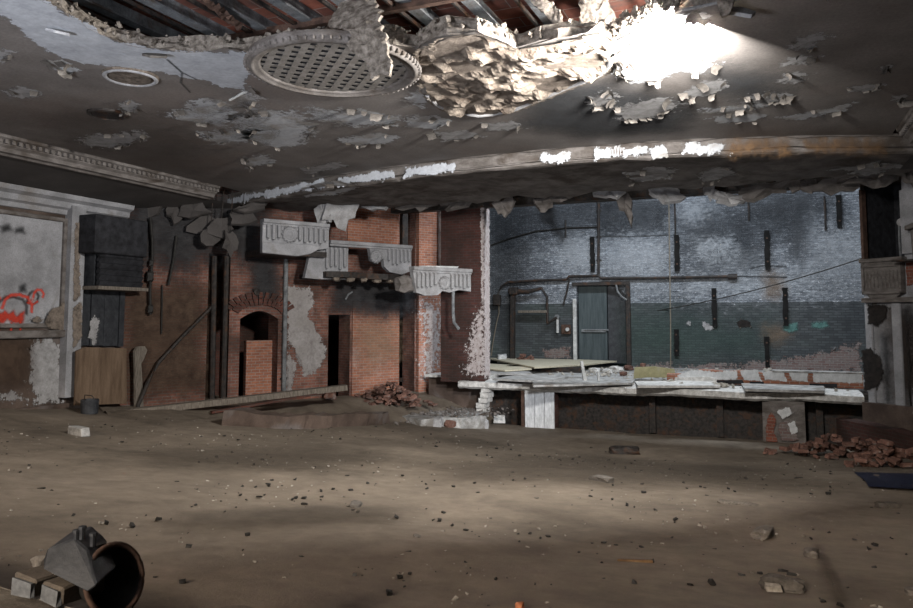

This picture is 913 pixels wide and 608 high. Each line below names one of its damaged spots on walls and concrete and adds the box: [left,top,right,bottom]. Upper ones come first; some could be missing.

spalling [0,0,895,172]
peeling [227,162,456,204]
peeling [594,144,678,187]
peeling [682,141,737,186]
peeling [0,222,100,406]
peeling [286,284,327,391]
spalling [332,275,415,293]
peeling [415,297,441,382]
peeling [461,208,491,381]